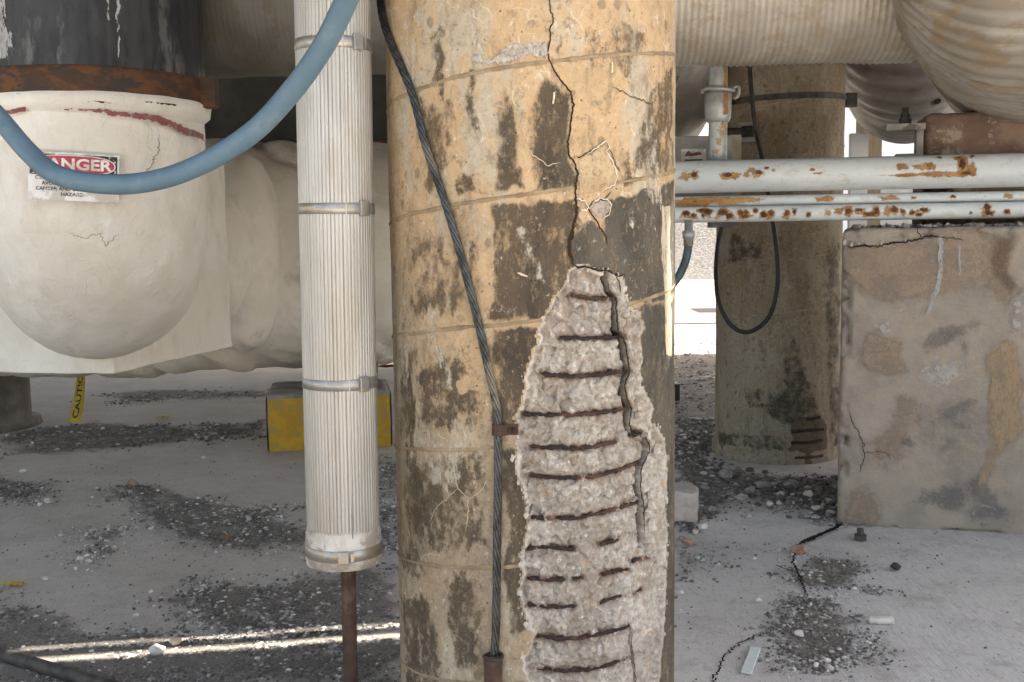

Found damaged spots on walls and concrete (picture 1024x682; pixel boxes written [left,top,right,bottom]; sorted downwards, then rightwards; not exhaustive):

spalling [471,42,548,64]
leakage [409,28,450,191]
crack [523,0,650,534]
crack [843,227,962,248]
leakage [399,68,675,682]
leakage [746,231,1015,446]
spalling [510,263,669,682]
spalling [789,415,828,464]
crack [849,411,890,472]
crack [776,523,843,597]
crack [711,628,773,682]